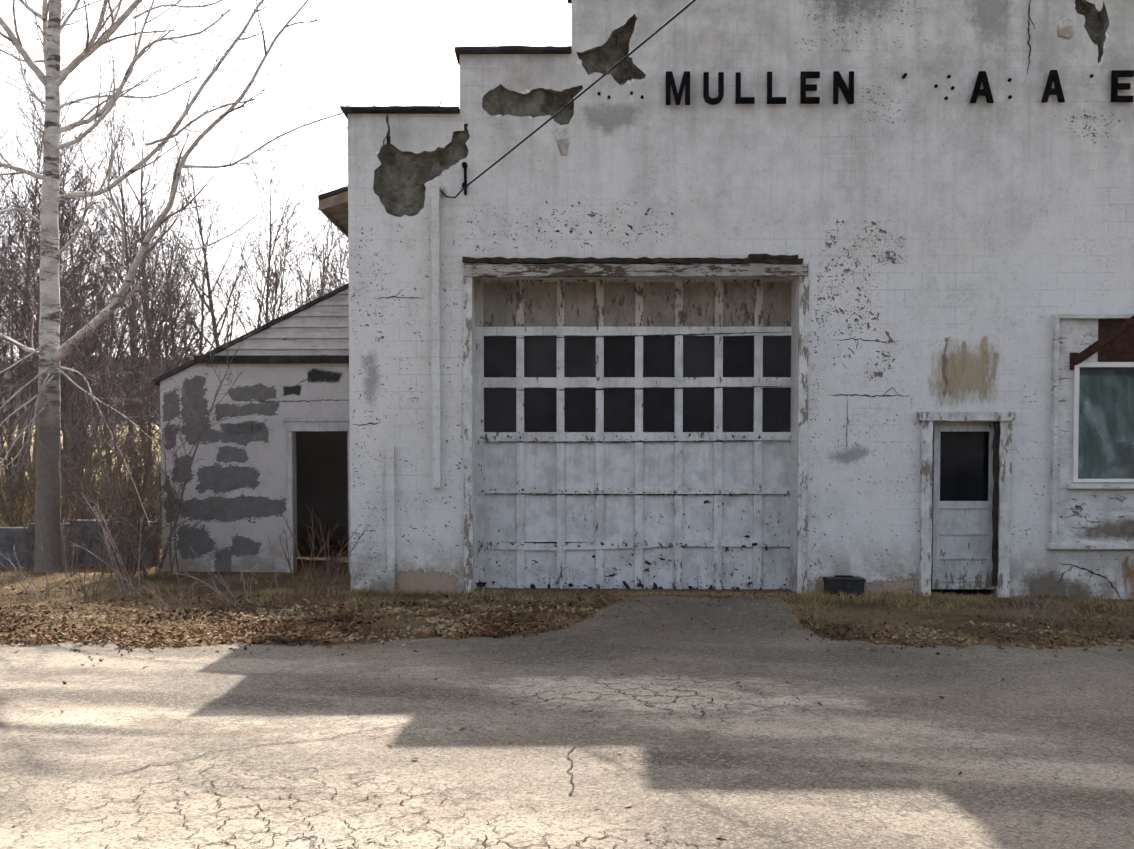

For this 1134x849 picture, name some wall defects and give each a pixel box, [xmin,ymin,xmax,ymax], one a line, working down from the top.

spalling [482,11,646,125]
peeling [795,0,929,52]
spalling [1073,0,1110,66]
spalling [373,124,673,266]
peeling [808,219,907,456]
rust [937,337,998,399]
crack [2,760,723,849]